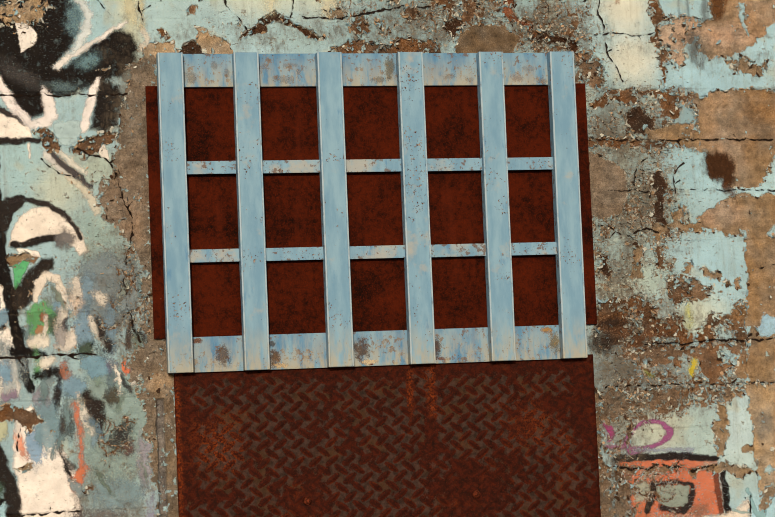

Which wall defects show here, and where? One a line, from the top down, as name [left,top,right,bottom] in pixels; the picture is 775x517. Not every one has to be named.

peeling [0,0,56,34]
crack [583,0,655,82]
peeling [32,0,234,206]
peeling [74,210,153,349]
peeling [228,0,775,517]
rust [216,346,229,363]
rust [269,341,288,368]
rust [353,338,377,365]
peeling [0,401,44,436]
peeling [94,349,175,481]